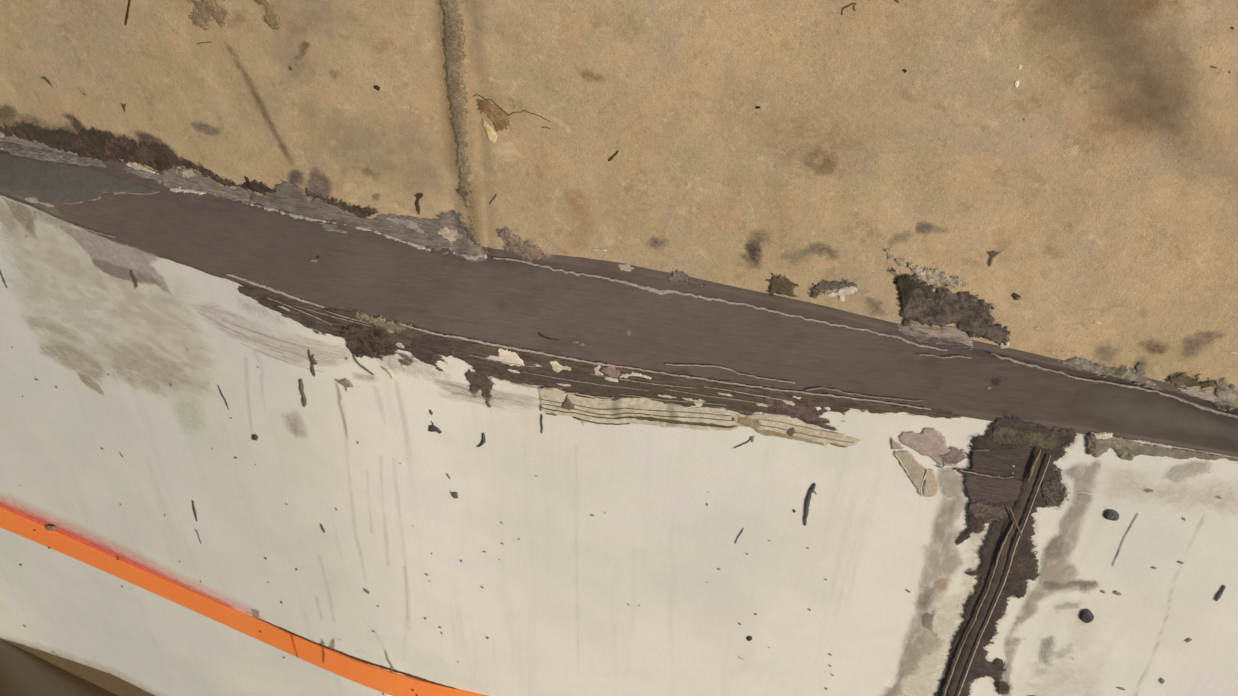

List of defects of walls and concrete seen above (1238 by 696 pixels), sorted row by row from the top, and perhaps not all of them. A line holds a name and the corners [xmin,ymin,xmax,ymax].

spalling [883,249,1011,350]
peeling [486,349,860,447]
peeling [894,451,940,497]